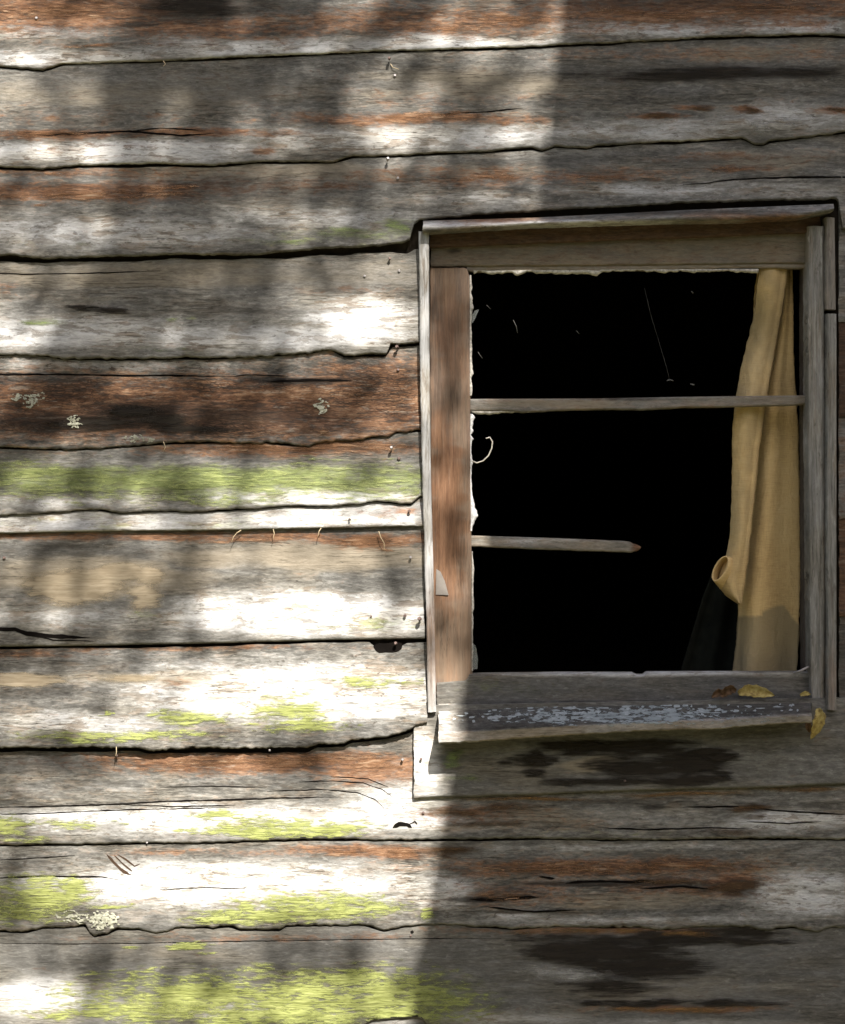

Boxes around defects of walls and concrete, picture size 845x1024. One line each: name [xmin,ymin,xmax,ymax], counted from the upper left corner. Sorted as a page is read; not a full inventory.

peeling [453,704,799,728]
leakage [498,739,740,786]
crack [470,876,713,913]
leakage [512,927,790,1007]